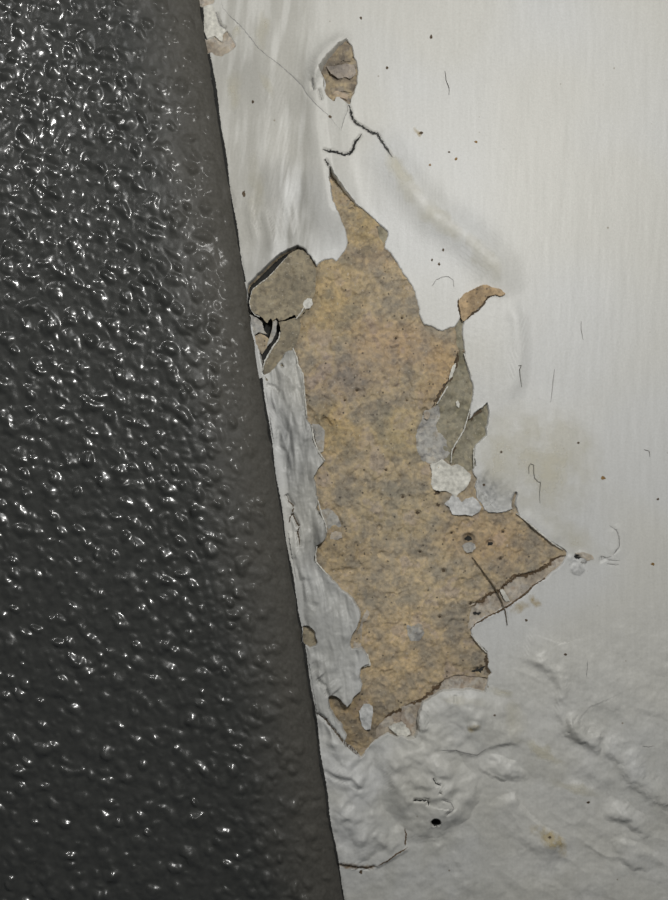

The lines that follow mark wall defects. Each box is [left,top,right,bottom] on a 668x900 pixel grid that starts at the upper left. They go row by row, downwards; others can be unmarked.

peeling [199,0,235,56]
crack [222,5,392,166]
peeling [321,42,358,104]
peeling [248,172,594,756]